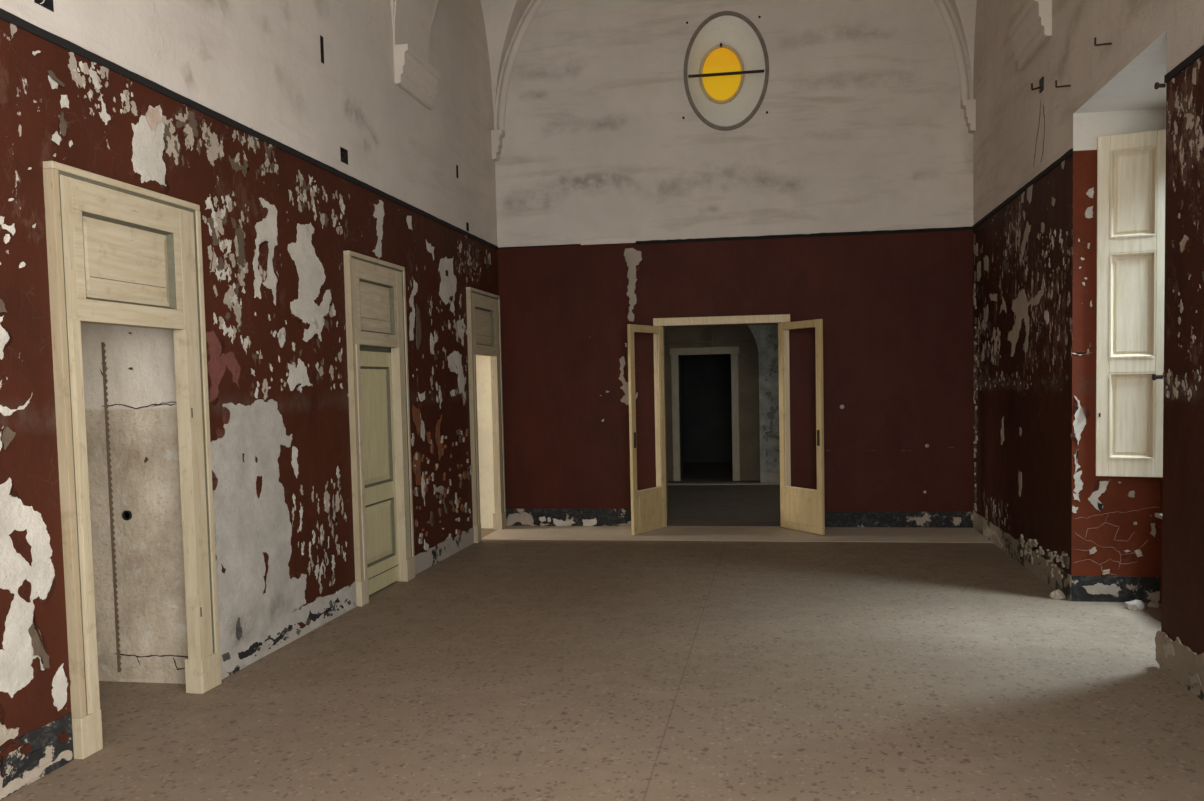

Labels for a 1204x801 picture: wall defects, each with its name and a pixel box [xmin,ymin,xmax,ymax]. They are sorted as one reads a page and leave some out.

peeling [47,52,279,194]
spalling [624,248,642,322]
peeling [0,299,13,360]
peeling [0,395,32,450]
crack [100,363,177,409]
peeling [202,170,353,674]
peeling [407,222,491,551]
peeling [973,184,1135,579]
crack [1074,507,1159,575]
spalling [1082,569,1121,595]
peeling [0,477,73,799]
spalling [1155,630,1204,693]